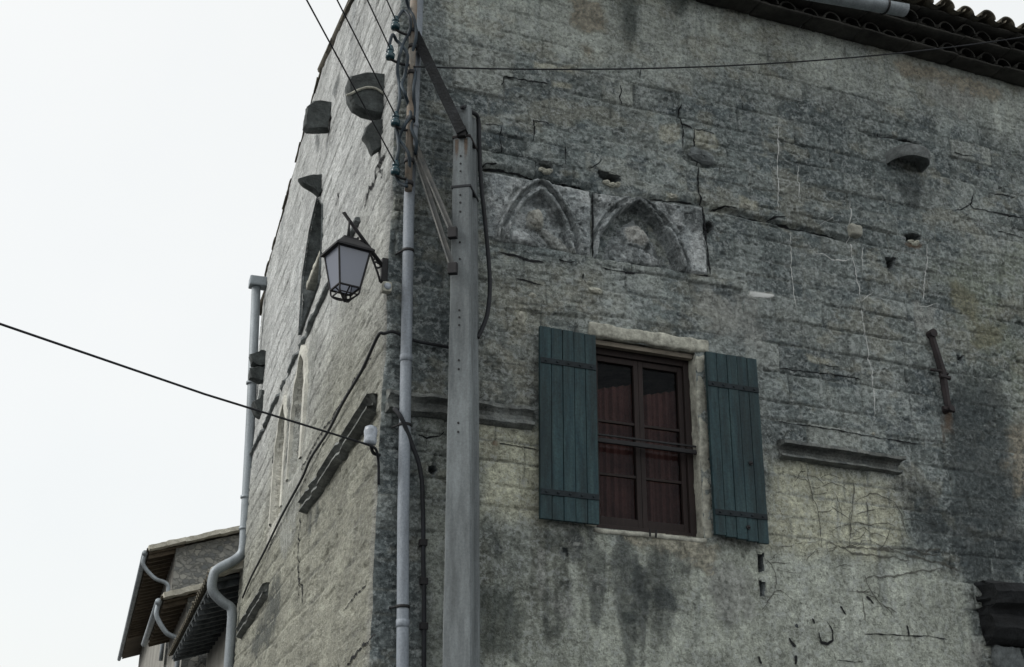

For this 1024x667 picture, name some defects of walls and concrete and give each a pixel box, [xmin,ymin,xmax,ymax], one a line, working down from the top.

crack [650,104,836,277]
crack [952,192,1024,238]
crack [296,495,304,603]
crack [866,632,945,640]